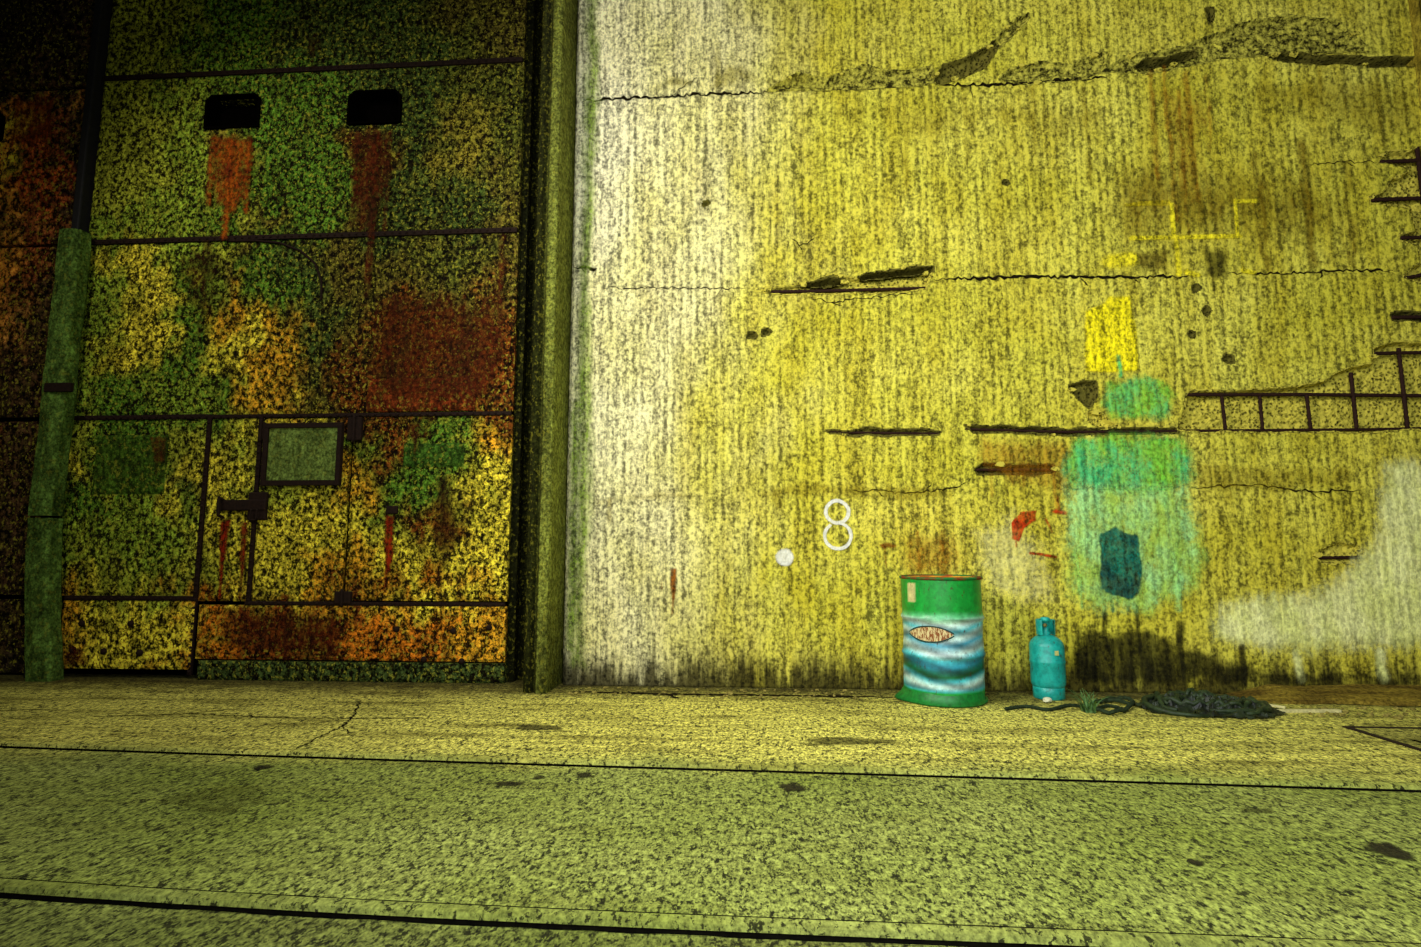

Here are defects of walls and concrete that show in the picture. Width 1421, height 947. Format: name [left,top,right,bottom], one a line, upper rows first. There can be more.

spalling [767,6,1415,92]
rust [206,135,251,239]
spalling [1367,145,1421,284]
spalling [755,264,935,295]
spalling [1390,310,1421,322]
spalling [963,341,1421,437]
rust [218,520,247,599]